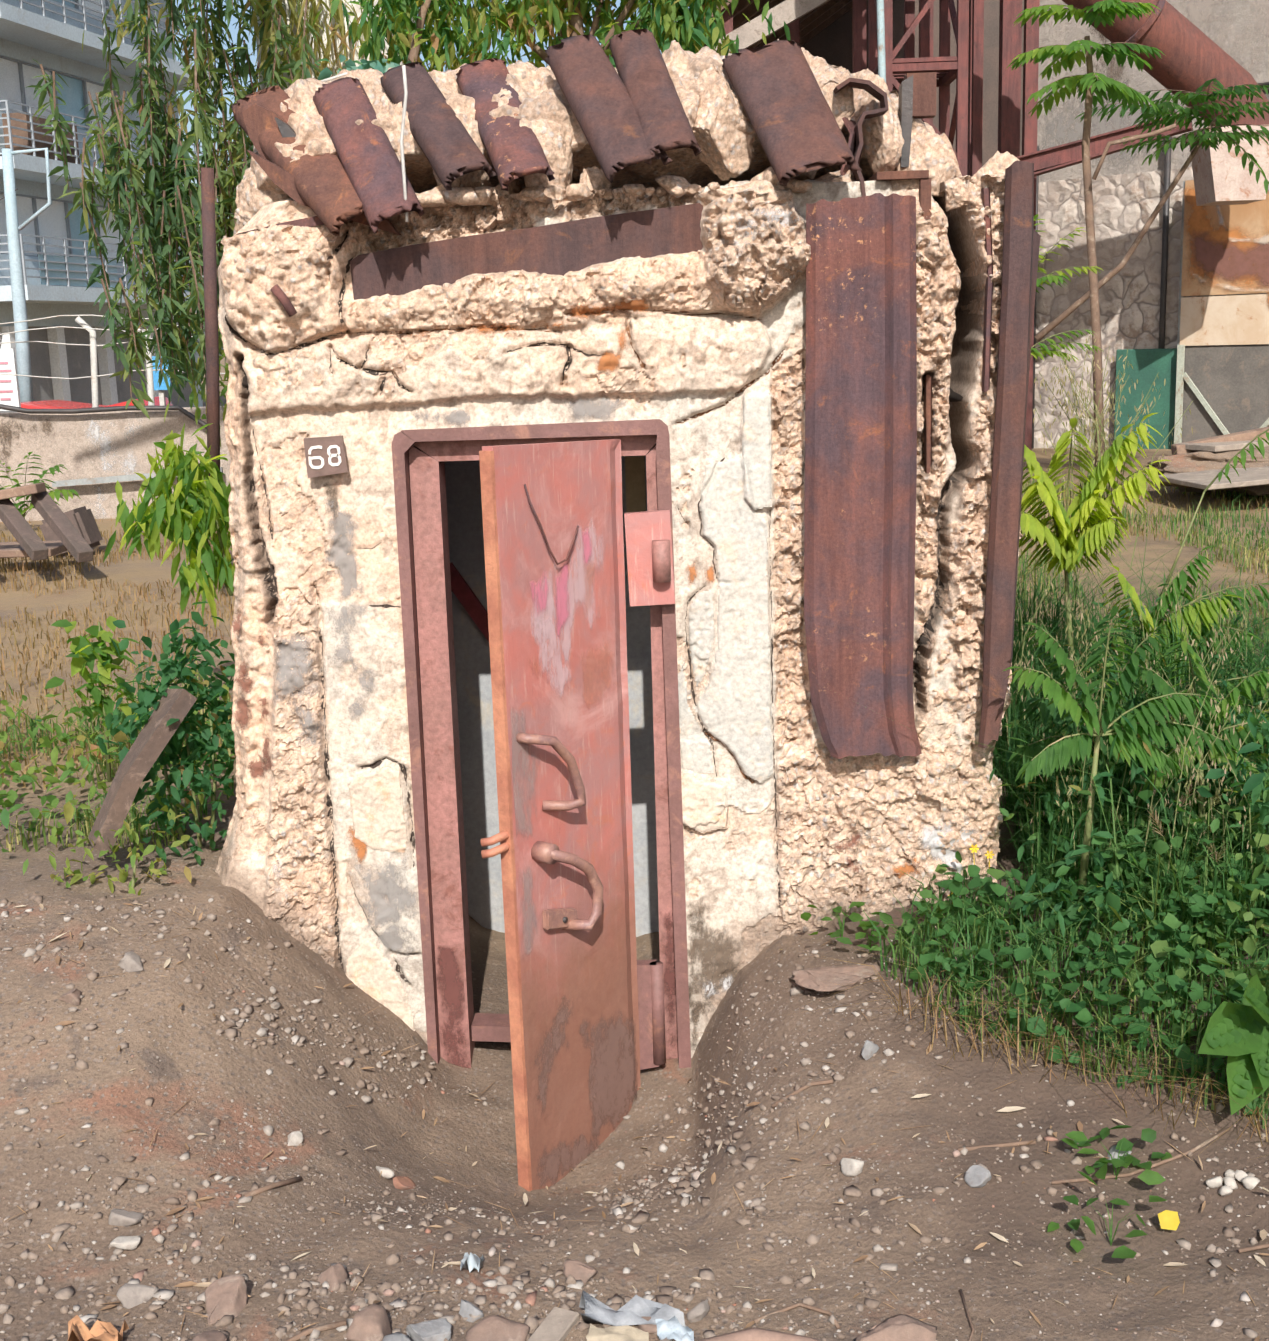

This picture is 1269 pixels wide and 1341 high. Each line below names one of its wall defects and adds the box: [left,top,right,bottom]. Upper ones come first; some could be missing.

crack [225,231,762,603]
crack [676,349,785,423]
crack [949,388,963,402]
crack [678,499,781,907]
crack [913,476,959,705]